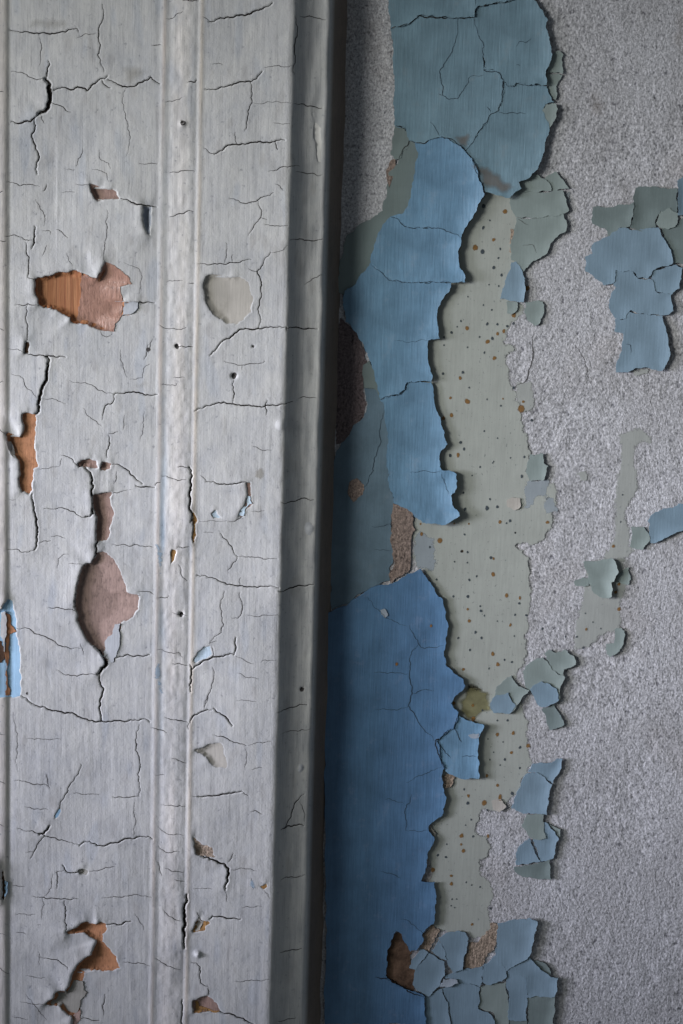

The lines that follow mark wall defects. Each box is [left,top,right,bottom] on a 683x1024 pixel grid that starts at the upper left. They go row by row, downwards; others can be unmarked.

crack [170,0,271,22]
peeling [90,184,119,201]
peeling [35,262,138,332]
peeling [6,413,38,494]
crack [0,4,323,1024]
peeling [324,0,683,1024]
peeling [75,492,139,662]
peeling [0,600,28,698]
peeling [193,838,215,857]
peeling [46,922,120,1024]
peeling [192,996,220,1013]